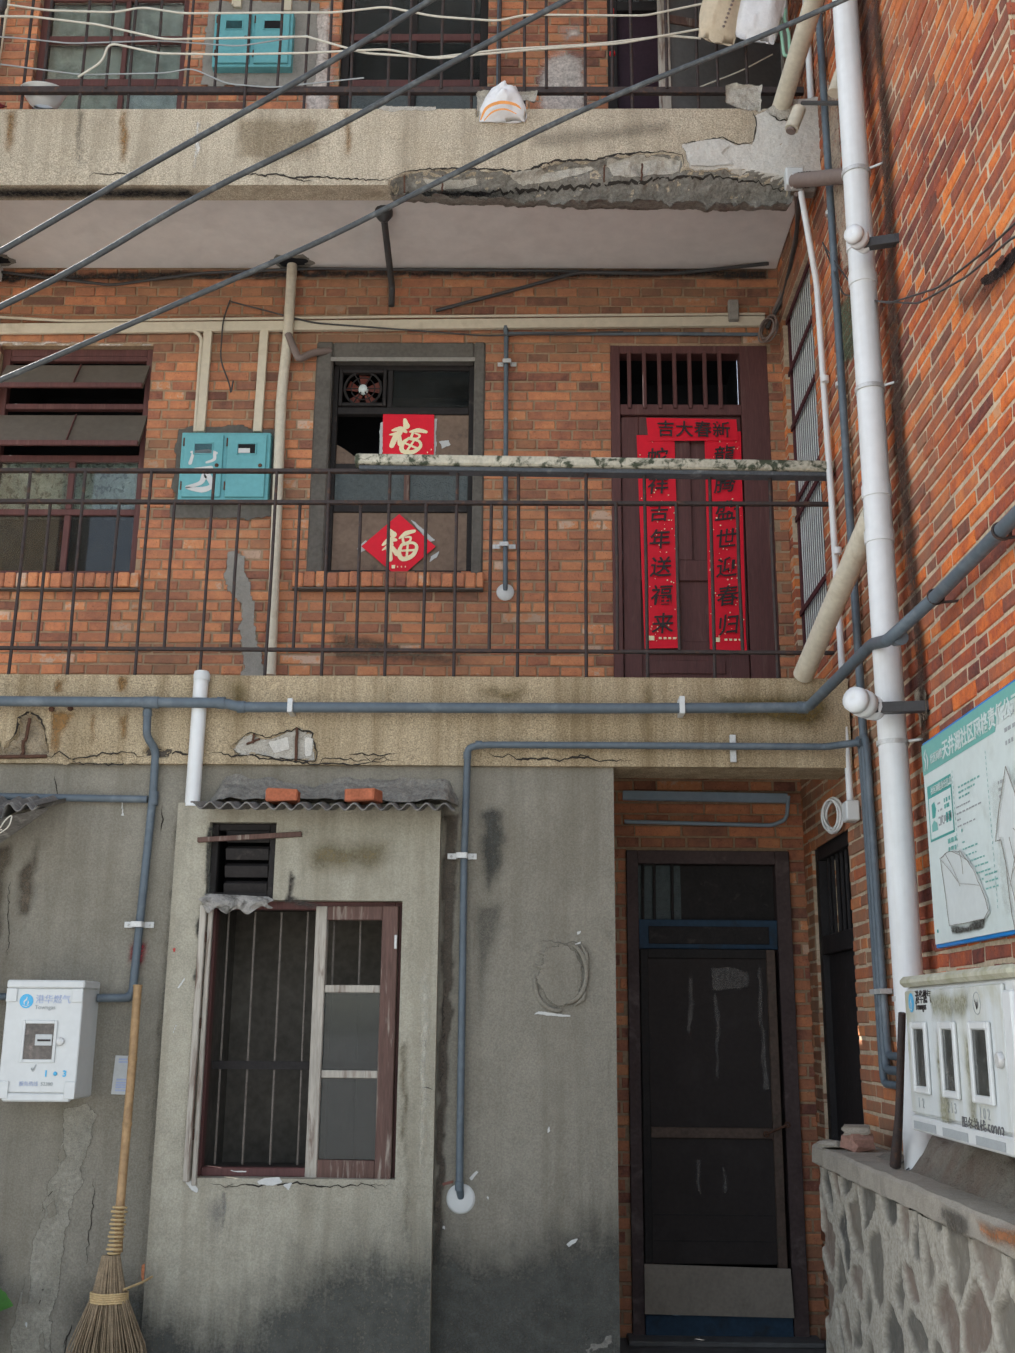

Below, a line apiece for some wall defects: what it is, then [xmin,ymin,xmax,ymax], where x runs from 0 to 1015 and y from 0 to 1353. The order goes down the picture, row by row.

crack [227,173,387,182]
spalling [387,139,793,213]
spalling [0,712,172,766]
spalling [233,727,317,762]
damp [129,811,620,1353]
crack [86,1184,95,1260]